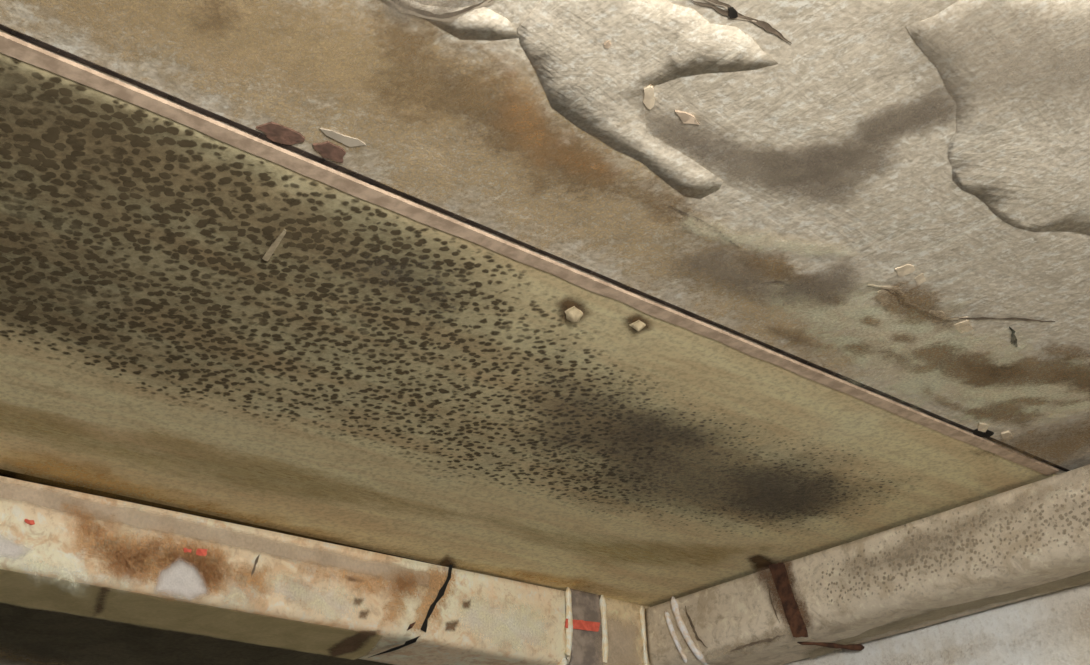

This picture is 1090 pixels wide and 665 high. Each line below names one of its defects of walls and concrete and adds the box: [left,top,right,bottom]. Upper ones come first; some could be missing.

crack [386,0,494,22]
crack [692,0,792,44]
water stain [0,0,1090,532]
corrosion [65,505,266,599]
peeling [158,562,205,598]
crack [368,564,453,658]
corrosion [749,555,810,627]
water stain [820,490,1090,602]